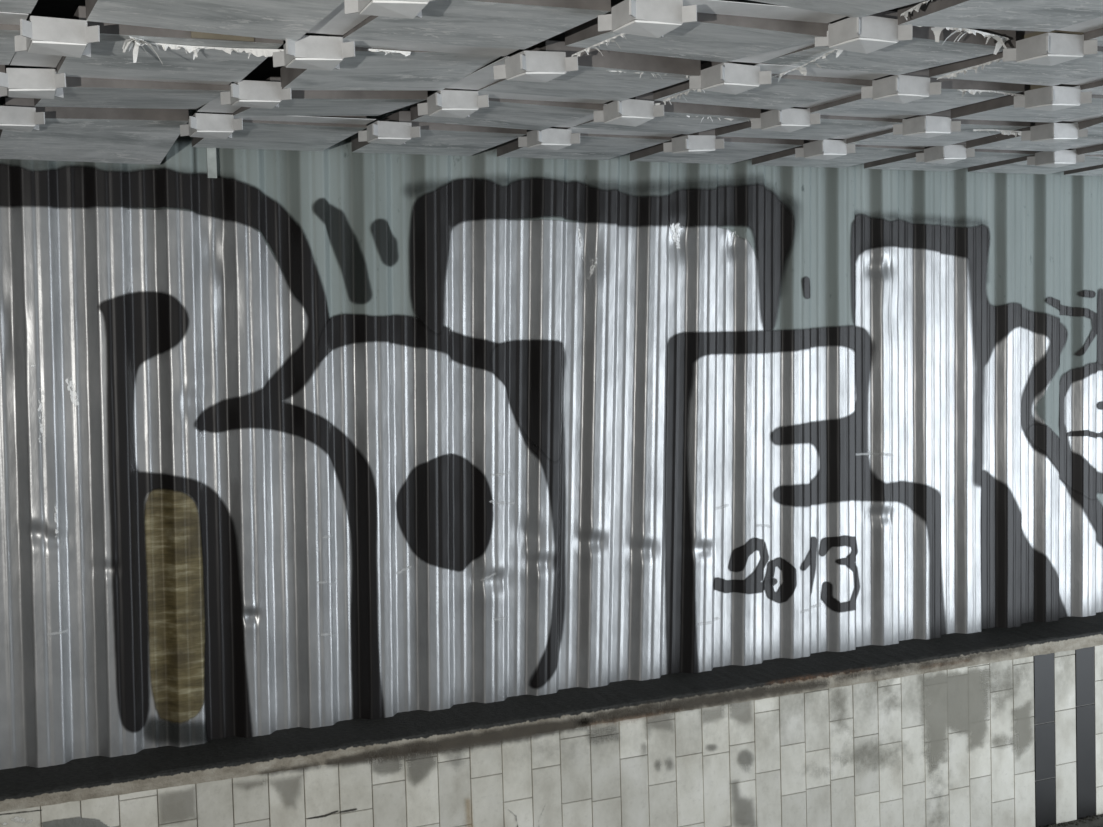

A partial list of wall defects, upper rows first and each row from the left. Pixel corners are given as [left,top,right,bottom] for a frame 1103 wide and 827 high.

damp [923,670,1032,770]
crack [308,808,357,819]